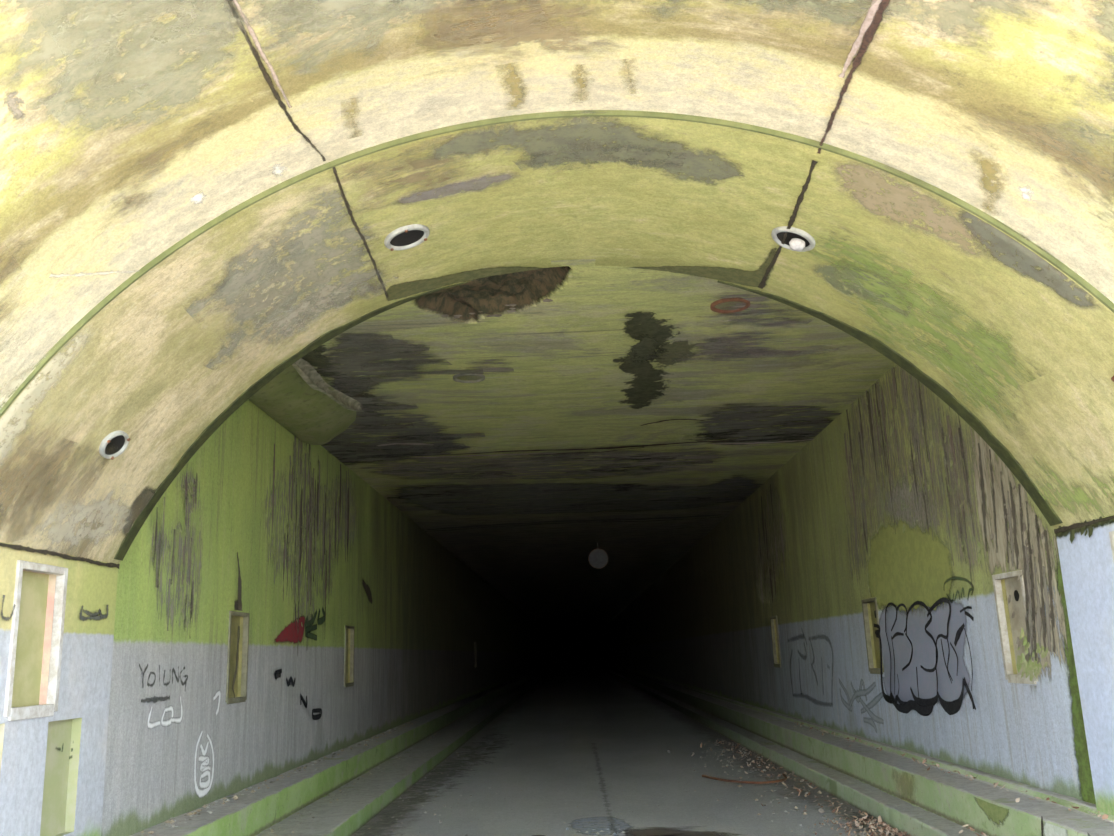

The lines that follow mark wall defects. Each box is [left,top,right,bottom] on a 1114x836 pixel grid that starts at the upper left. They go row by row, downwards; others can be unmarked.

crack [226,0,389,298]
water stain [353,111,743,204]
crack [758,0,890,289]
water stain [186,191,542,369]
water stain [613,248,839,409]
water stain [302,333,841,515]